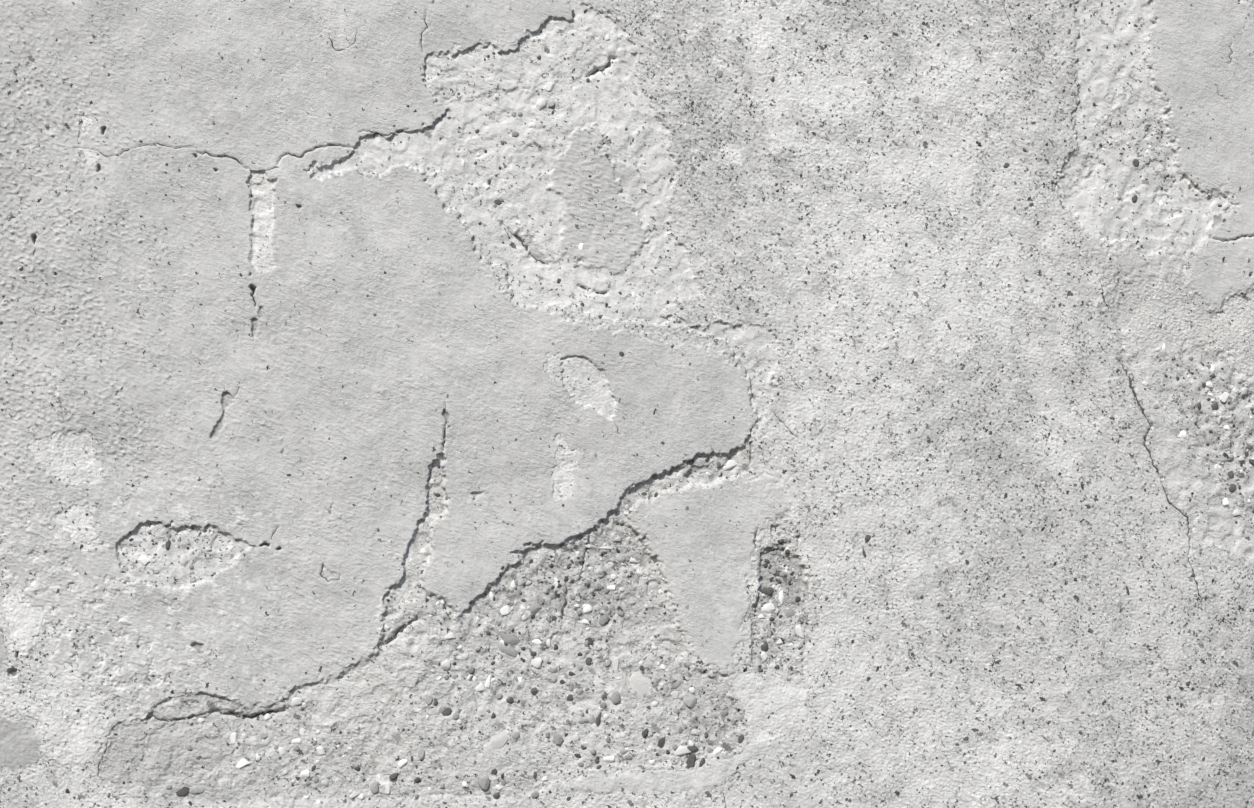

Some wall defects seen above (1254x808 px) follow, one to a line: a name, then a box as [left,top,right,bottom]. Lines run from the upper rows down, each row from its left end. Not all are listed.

crack [79,129,408,170]
spalling [0,0,782,808]
spalling [748,520,812,681]
spalling [1055,0,1254,570]
crack [1119,361,1203,606]